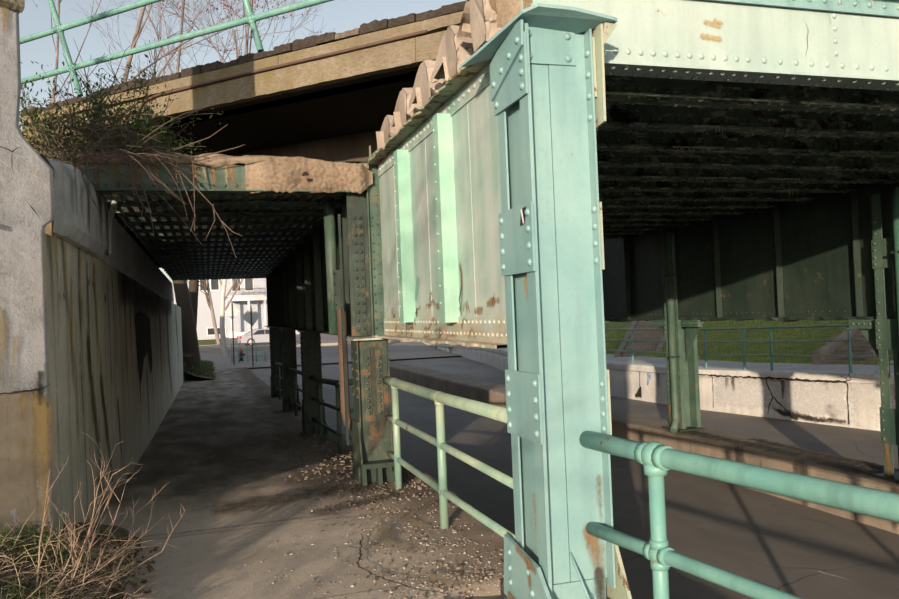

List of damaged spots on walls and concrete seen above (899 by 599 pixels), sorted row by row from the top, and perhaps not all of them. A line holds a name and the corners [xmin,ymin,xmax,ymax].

rust [701,19,722,41]
crack [0,384,50,394]
crack [699,373,851,416]
rust [515,544,535,587]